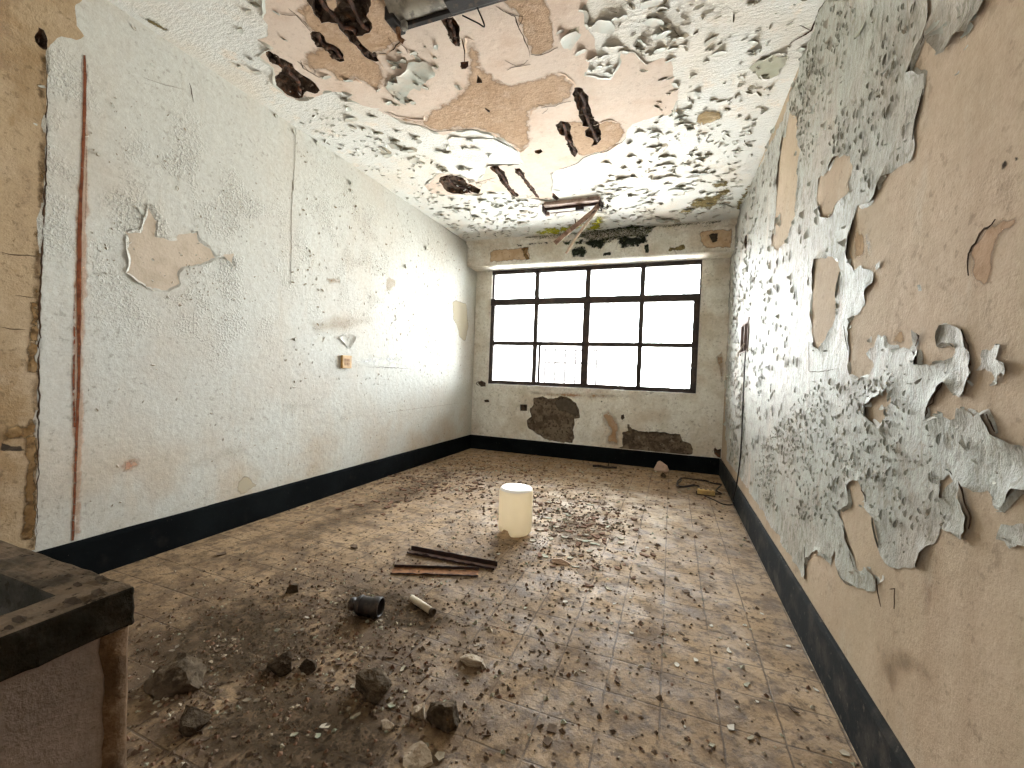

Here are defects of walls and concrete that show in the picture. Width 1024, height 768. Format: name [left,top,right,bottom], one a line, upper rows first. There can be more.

flaking render [0,0,84,550]
rust [71,55,87,541]
peeling [90,174,365,400]
peeling [237,0,1024,592]